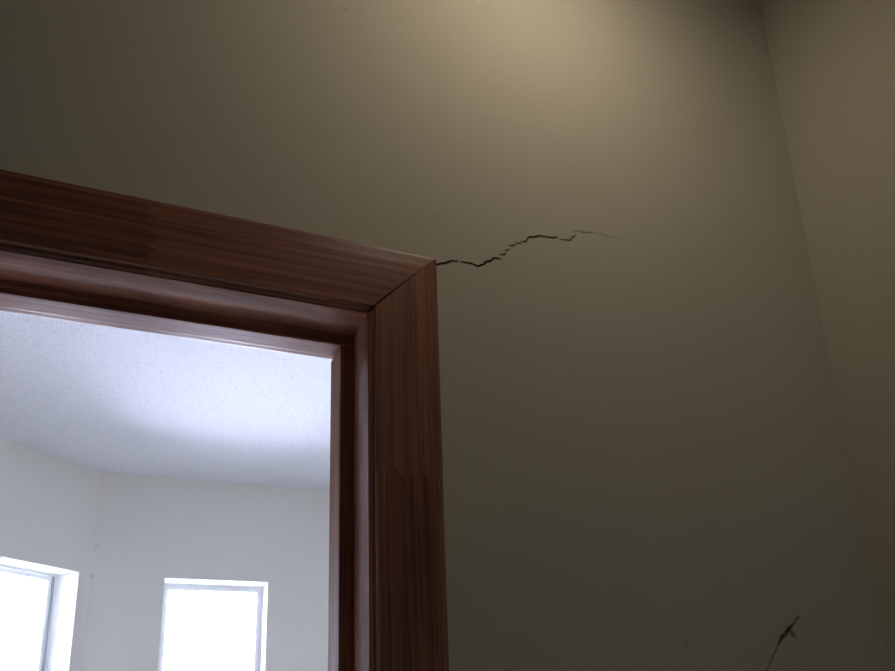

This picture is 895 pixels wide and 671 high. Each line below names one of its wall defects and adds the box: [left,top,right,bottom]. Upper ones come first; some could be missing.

crack [436,230,589,267]